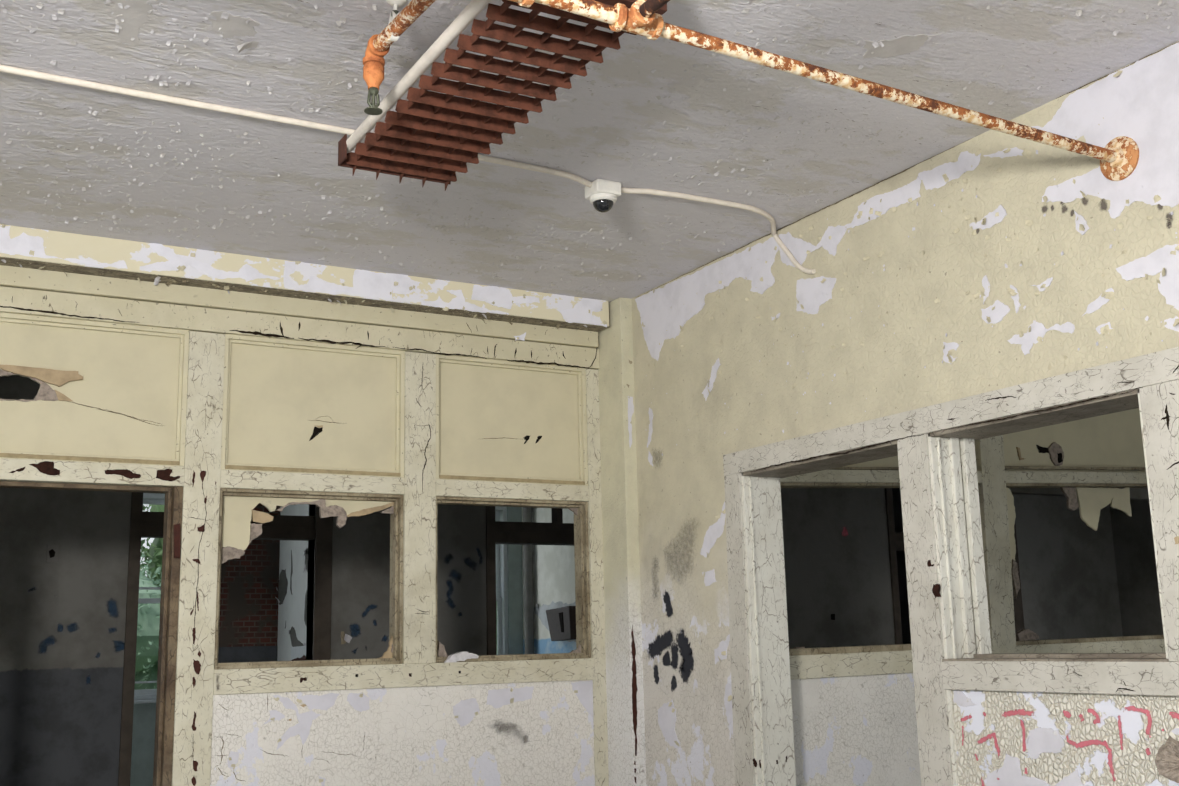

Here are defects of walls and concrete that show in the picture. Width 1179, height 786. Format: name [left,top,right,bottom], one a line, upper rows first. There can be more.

peeling [970,0,1179,355]
crack [0,295,140,323]
peeling [0,97,1038,469]
crack [58,400,160,426]
crack [229,322,599,492]
crack [752,381,1143,472]
crack [1161,365,1179,429]
peeling [264,677,339,750]
spalling [1155,728,1179,783]